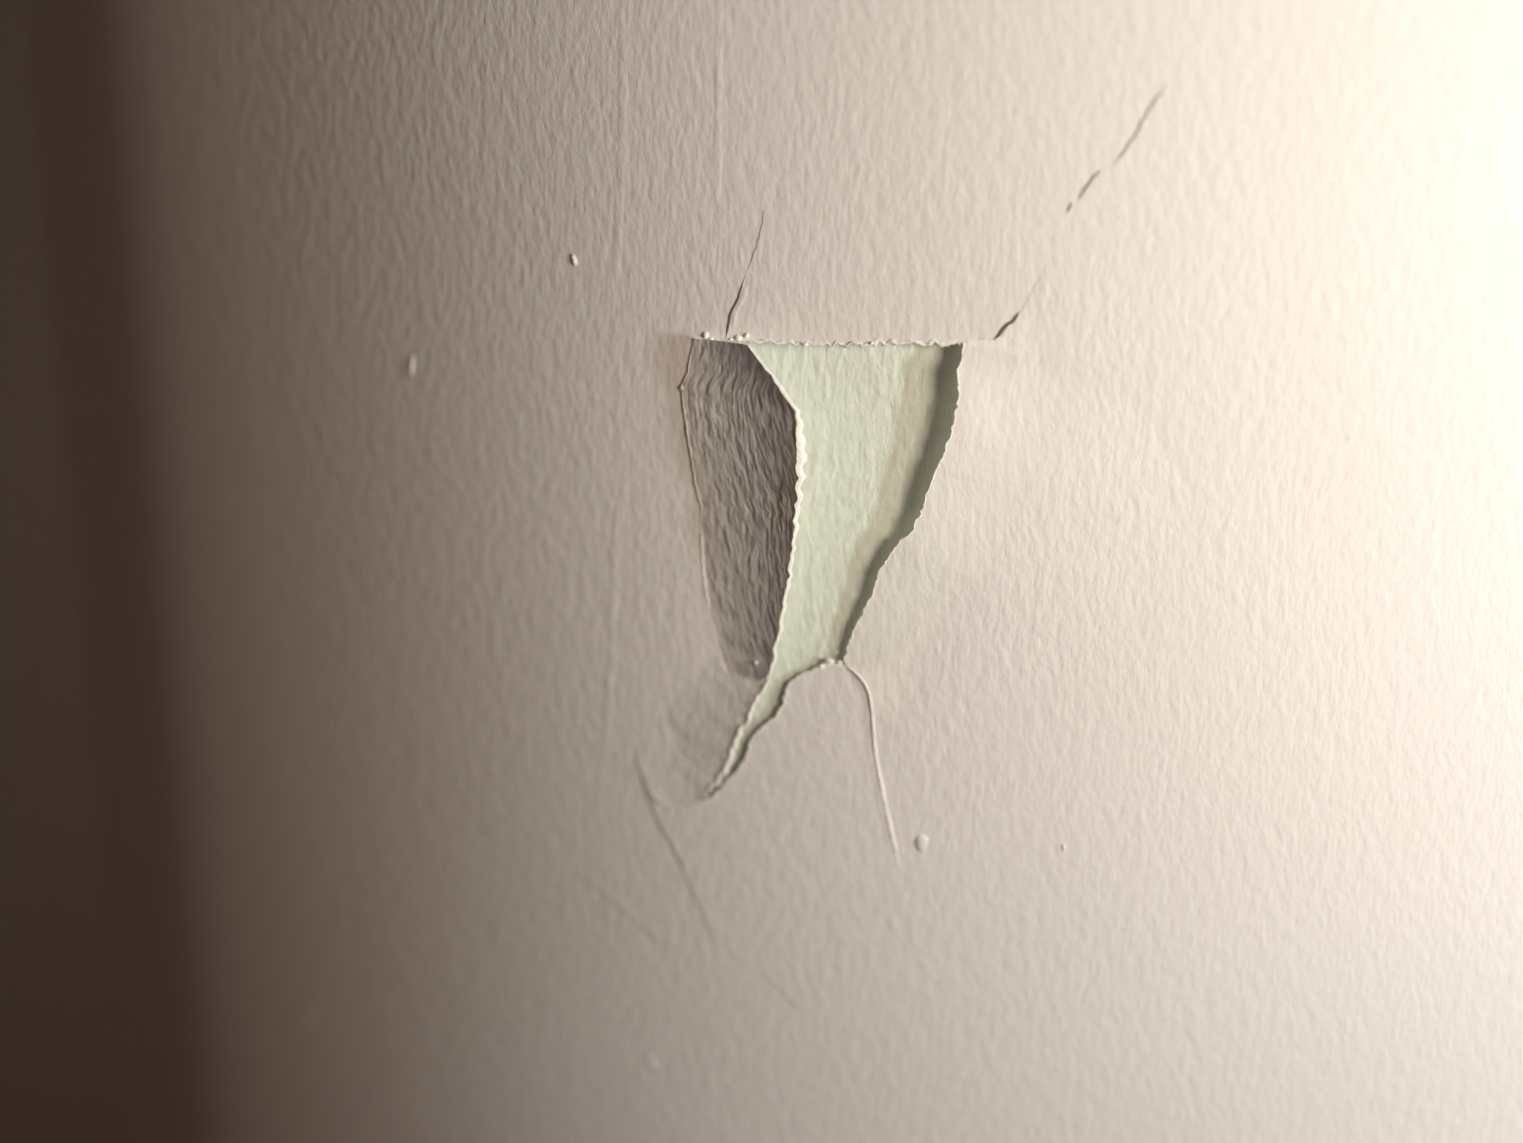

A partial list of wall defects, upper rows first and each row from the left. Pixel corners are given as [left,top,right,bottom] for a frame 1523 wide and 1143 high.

crack [1067,85,1167,214]
crack [981,313,1019,341]
flaking render [702,340,964,801]